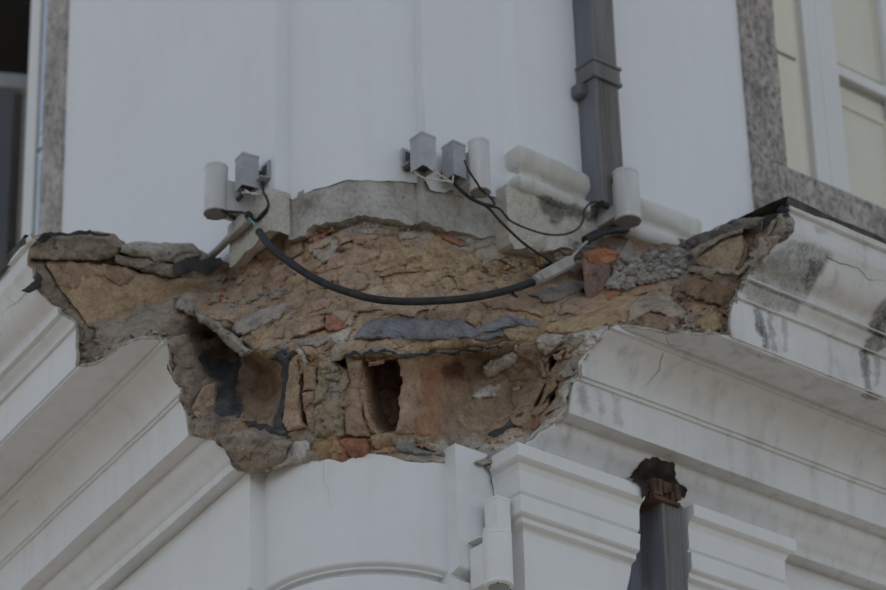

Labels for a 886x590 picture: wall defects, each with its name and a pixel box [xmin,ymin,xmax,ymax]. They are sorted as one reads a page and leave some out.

spalling [22,176,795,474]
water stain [863,303,886,376]